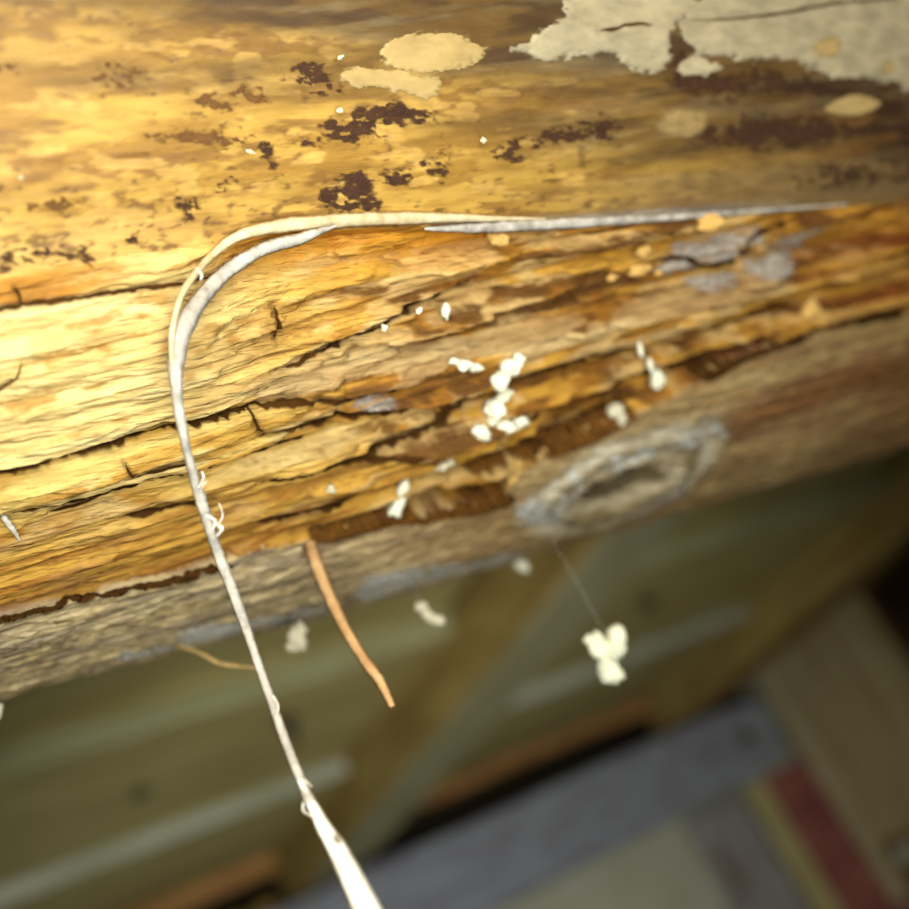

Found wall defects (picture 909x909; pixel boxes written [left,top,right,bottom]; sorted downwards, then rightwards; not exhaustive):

crack [0,276,209,312]
crack [272,306,282,339]
crack [274,279,470,371]
crack [730,302,797,320]
crack [0,361,22,390]
crack [0,389,470,518]
crack [250,335,813,549]
crack [0,563,238,624]